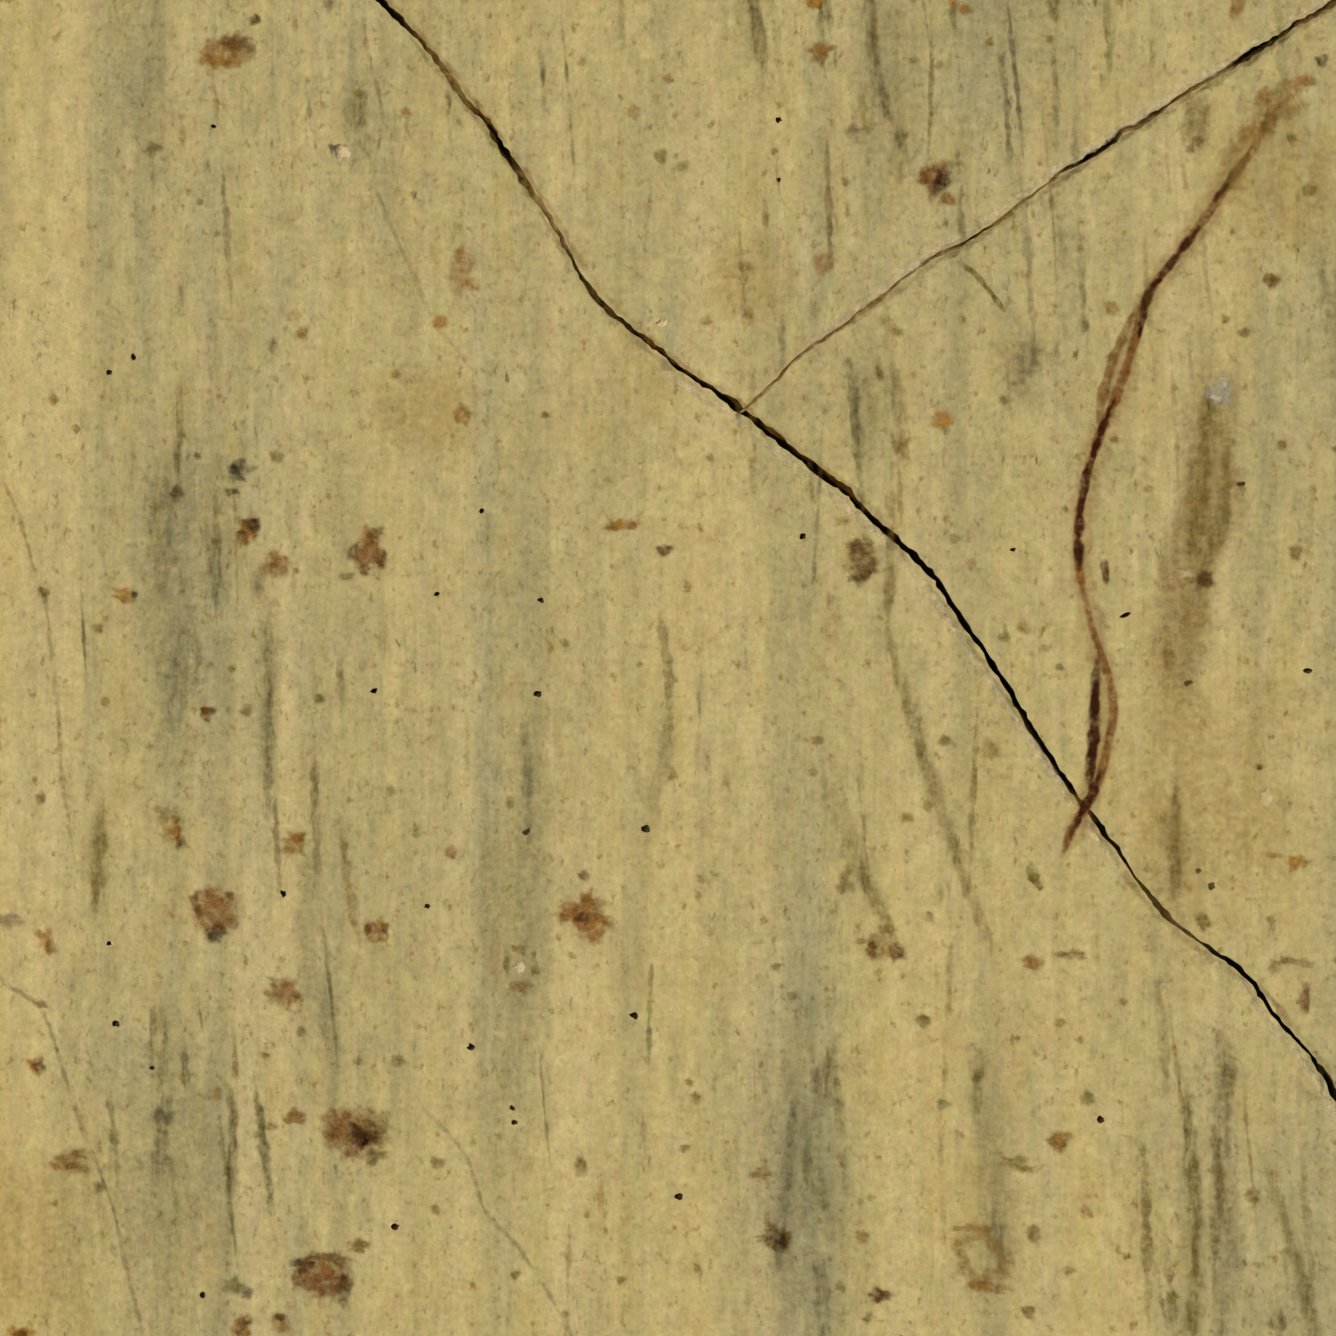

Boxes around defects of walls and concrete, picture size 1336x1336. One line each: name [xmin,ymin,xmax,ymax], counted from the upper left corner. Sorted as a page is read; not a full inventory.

corrosion [198,35,246,66]
corrosion [1264,274,1279,287]
corrosion [348,529,385,574]
crack [375,0,1336,1122]
corrosion [1197,571,1212,586]
corrosion [194,891,232,941]
corrosion [559,893,605,942]
corrosion [326,1109,385,1165]
corrosion [292,1240,367,1300]